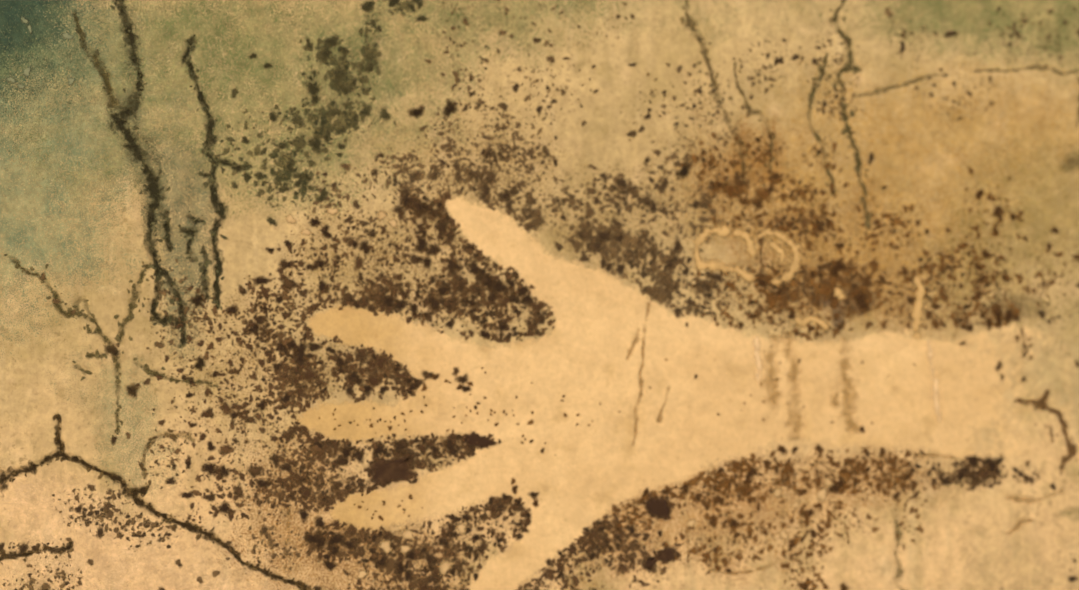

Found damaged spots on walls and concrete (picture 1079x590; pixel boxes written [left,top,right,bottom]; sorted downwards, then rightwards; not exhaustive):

crack [680,0,776,183]
crack [808,0,947,228]
crack [974,65,1079,125]
crack [4,0,252,437]
crack [0,414,307,590]
crack [1008,390,1077,534]